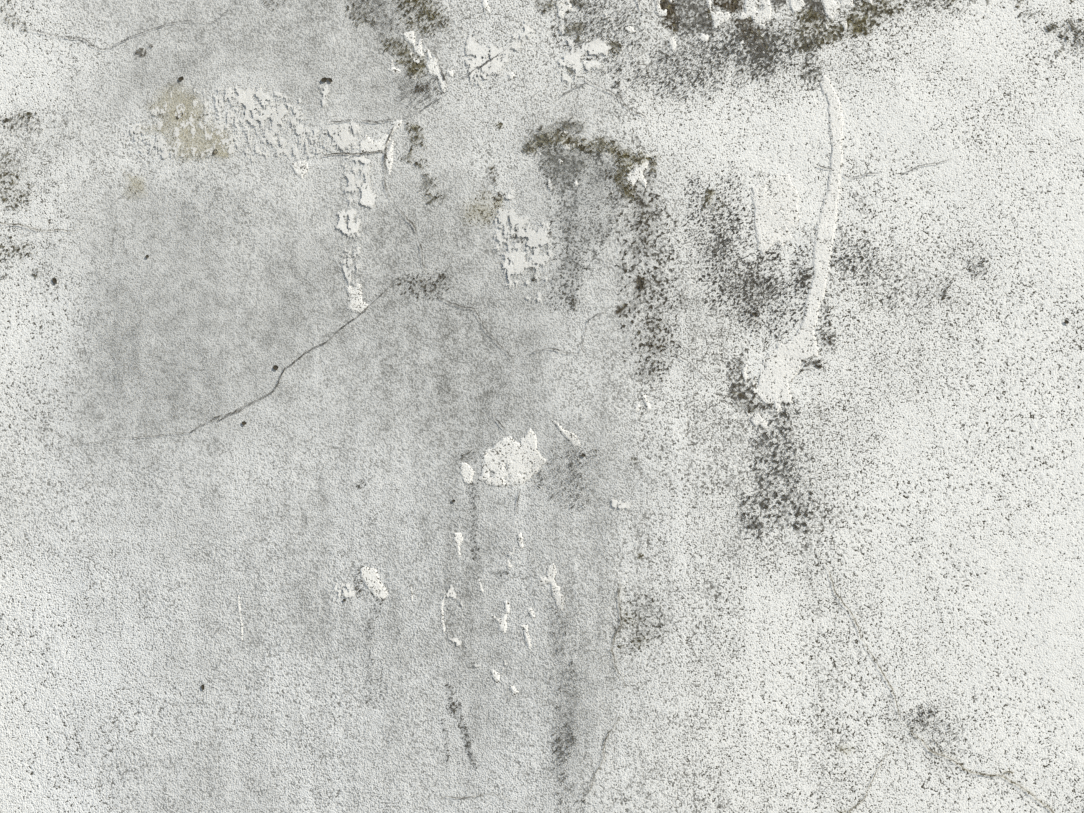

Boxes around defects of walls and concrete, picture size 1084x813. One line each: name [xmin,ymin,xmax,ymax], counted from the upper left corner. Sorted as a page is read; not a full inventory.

water stain [551,0,827,101]
peeling [128,76,402,313]
peeling [494,188,552,310]
water stain [521,116,953,384]
crack [95,282,393,443]
peeling [459,428,546,487]
water stain [530,435,602,513]
water stain [726,354,816,539]
peeling [328,566,388,602]
water stain [549,596,587,813]
water stain [613,590,671,656]
crack [812,544,1054,813]